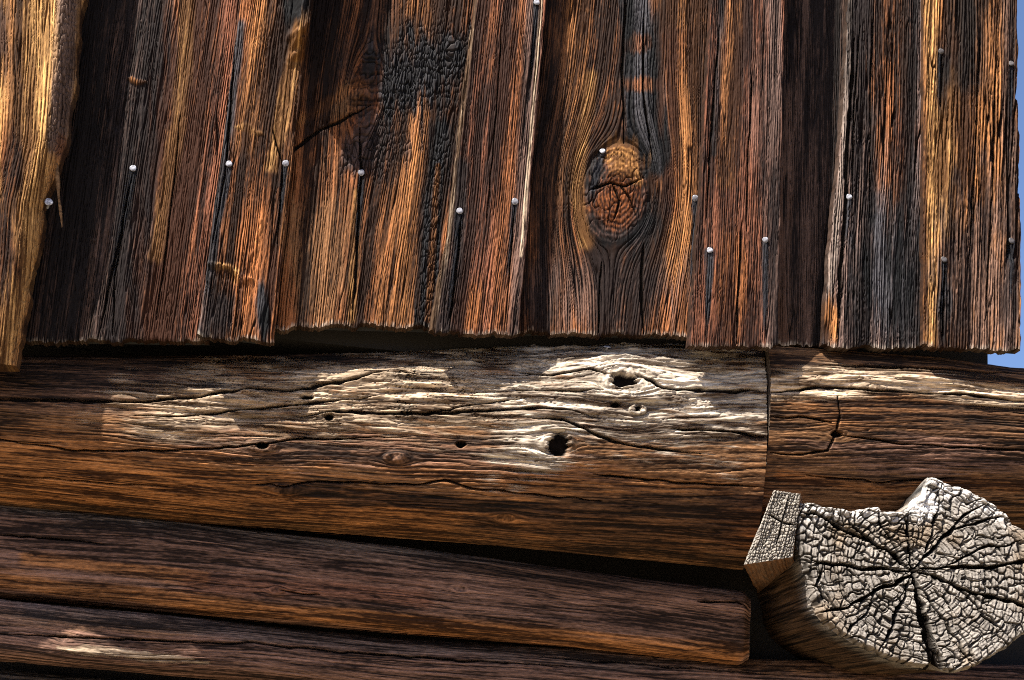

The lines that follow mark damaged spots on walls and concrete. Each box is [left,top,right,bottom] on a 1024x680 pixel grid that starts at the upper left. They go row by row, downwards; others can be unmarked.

crack [273,107,367,317]